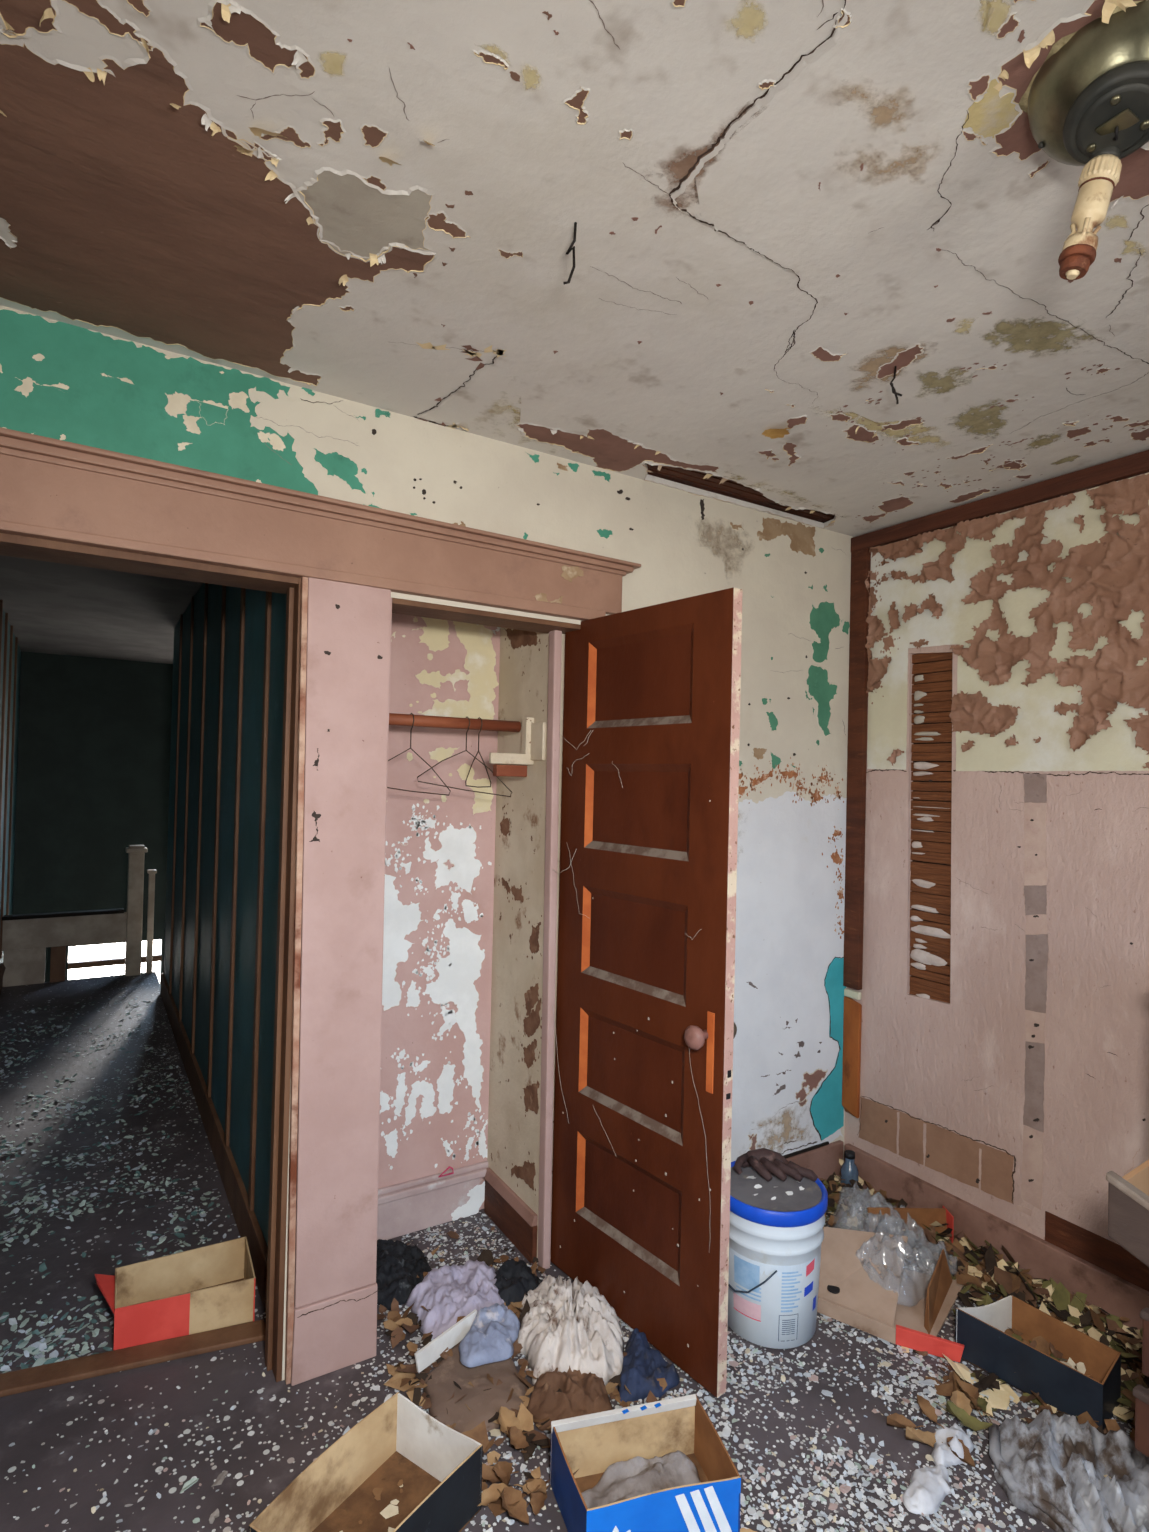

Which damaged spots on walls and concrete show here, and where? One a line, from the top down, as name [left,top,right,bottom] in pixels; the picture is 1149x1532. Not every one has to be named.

peeling [0,0,473,510]
crack [593,267,708,315]
crack [622,0,848,398]
crack [929,110,1149,430]
peeling [960,0,1142,179]
peeling [1108,142,1149,210]
peeling [515,422,1043,550]
peeling [377,616,538,720]
peeling [748,474,1149,768]
peeling [738,743,841,801]
peeling [380,746,546,1280]
spalling [761,957,846,1141]